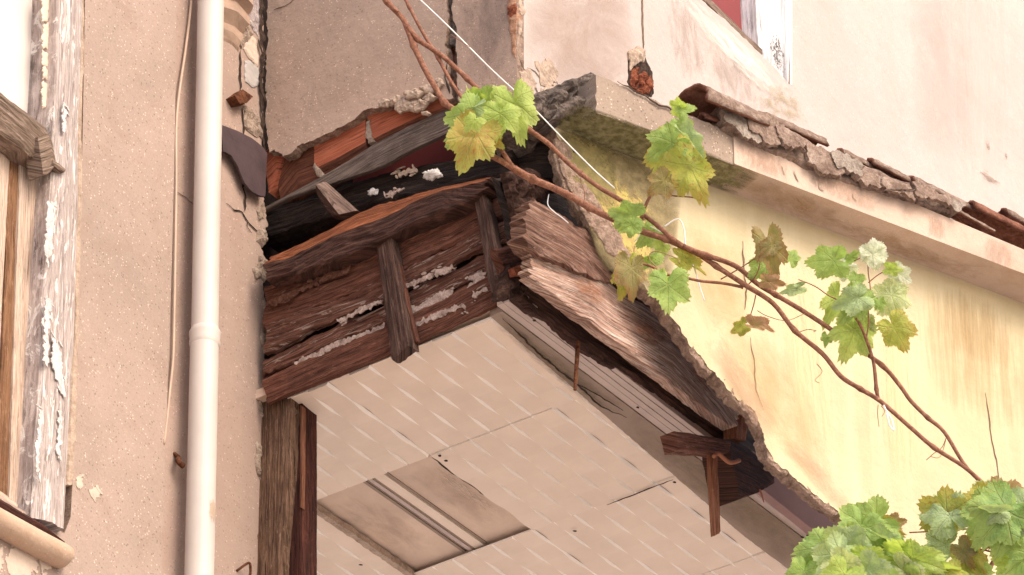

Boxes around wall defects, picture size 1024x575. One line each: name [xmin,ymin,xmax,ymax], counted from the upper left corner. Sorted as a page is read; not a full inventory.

peeling [61,102,69,133]
crack [239,0,293,151]
spalling [378,78,445,117]
peeling [43,201,57,268]
crack [226,184,257,233]
peeling [41,297,66,397]
peeling [34,404,44,483]
peeling [55,409,63,461]